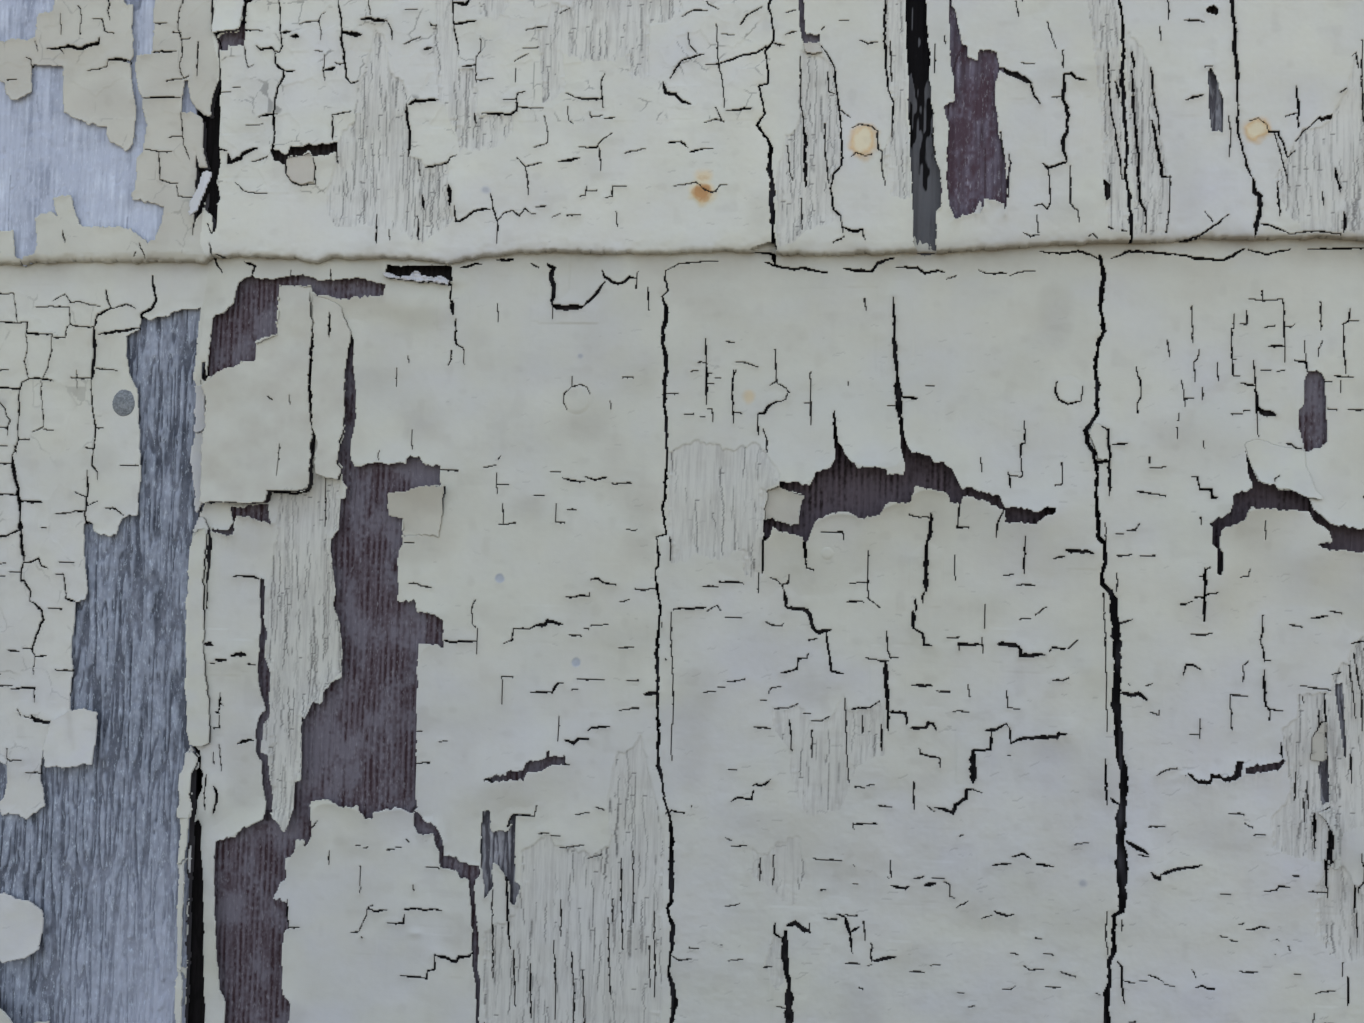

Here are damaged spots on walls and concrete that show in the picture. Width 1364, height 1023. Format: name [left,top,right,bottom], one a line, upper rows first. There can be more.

crack [7,0,718,366]
rust [685,175,720,208]
rust [844,119,883,164]
peeling [883,0,1010,256]
crack [663,0,1364,418]
rust [1239,113,1275,147]
peeling [0,265,665,1023]
peeling [667,434,1050,583]
crack [441,290,1364,837]
peeling [1210,370,1364,565]
crack [400,805,973,1023]
peeling [1185,636,1364,963]